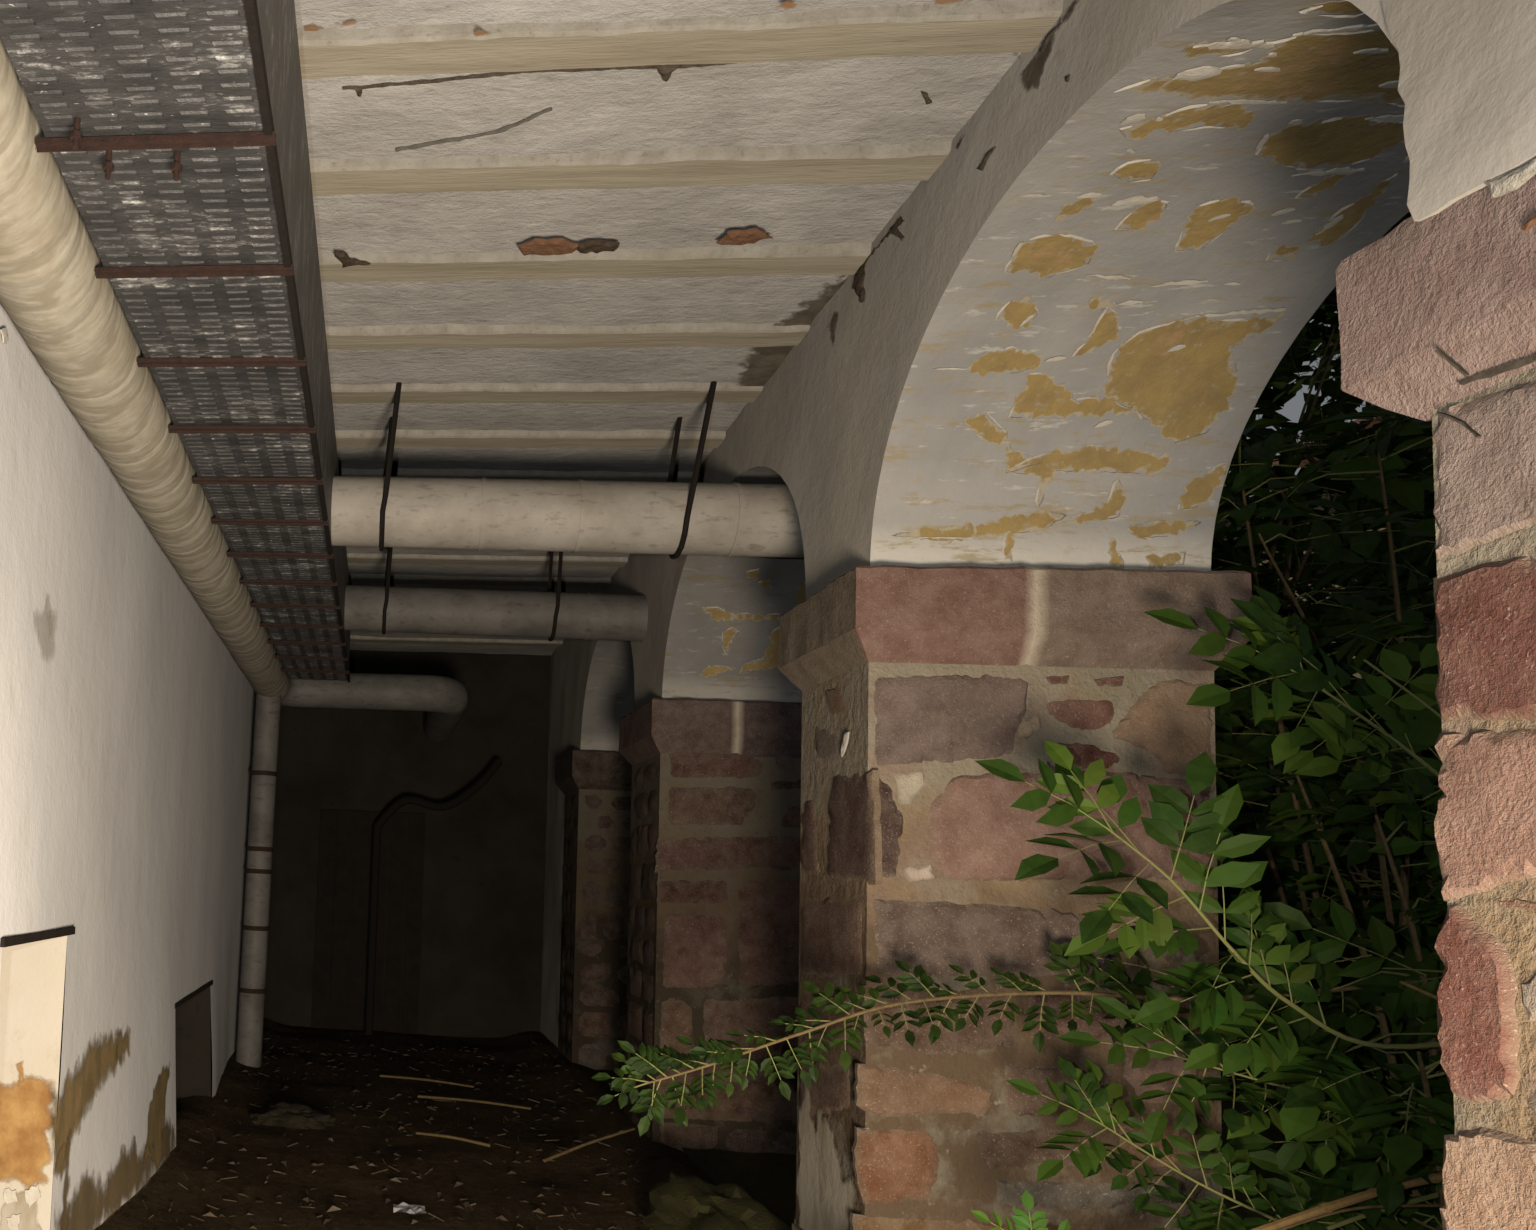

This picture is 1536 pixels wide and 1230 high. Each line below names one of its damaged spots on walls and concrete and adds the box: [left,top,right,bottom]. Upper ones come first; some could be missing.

peeling [892,0,1410,570]
peeling [699,606,782,678]
flaking render [0,1183,42,1230]